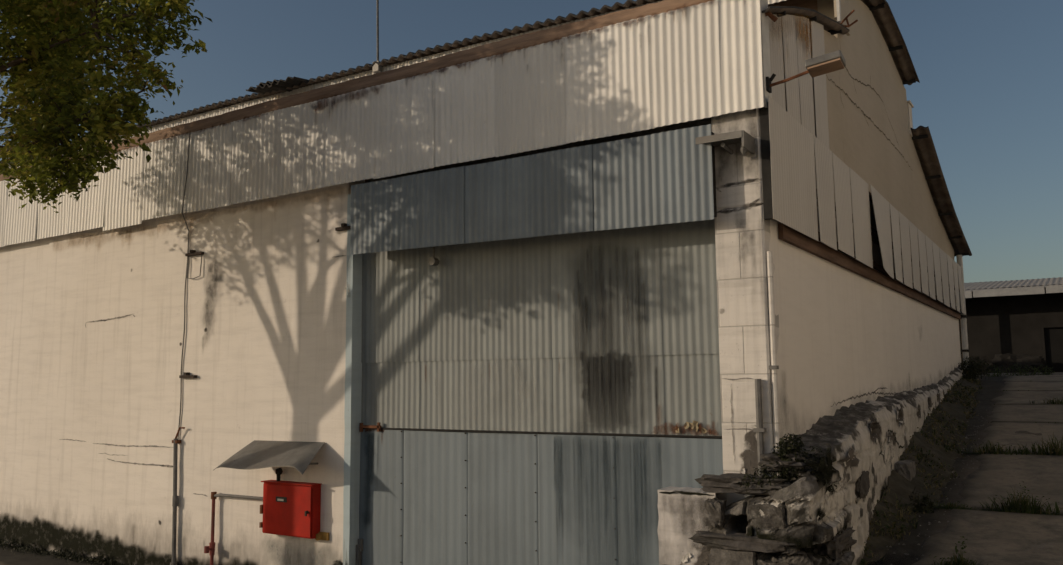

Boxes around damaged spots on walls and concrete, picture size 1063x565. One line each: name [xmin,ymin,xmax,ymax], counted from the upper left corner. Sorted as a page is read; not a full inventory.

crack [826,36,911,168]
crack [59,439,173,467]